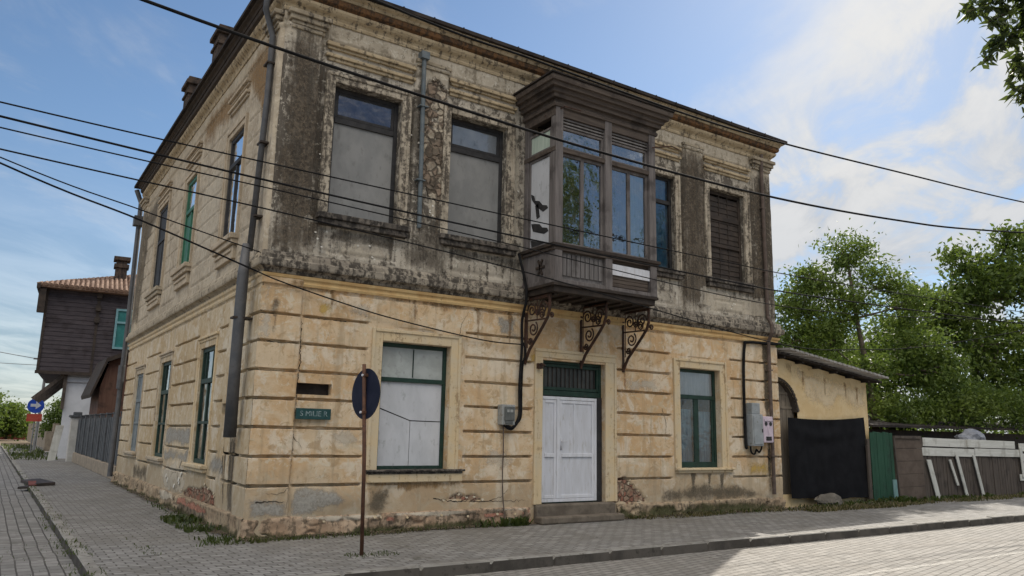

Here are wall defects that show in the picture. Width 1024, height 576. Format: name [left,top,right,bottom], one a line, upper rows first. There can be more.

spalling [411,77,449,217]
water stain [320,229,394,254]
water stain [406,192,519,279]
water stain [397,298,516,336]
crack [255,317,346,512]
peeling [159,461,215,514]
peeling [397,493,484,519]
spalling [614,477,647,503]